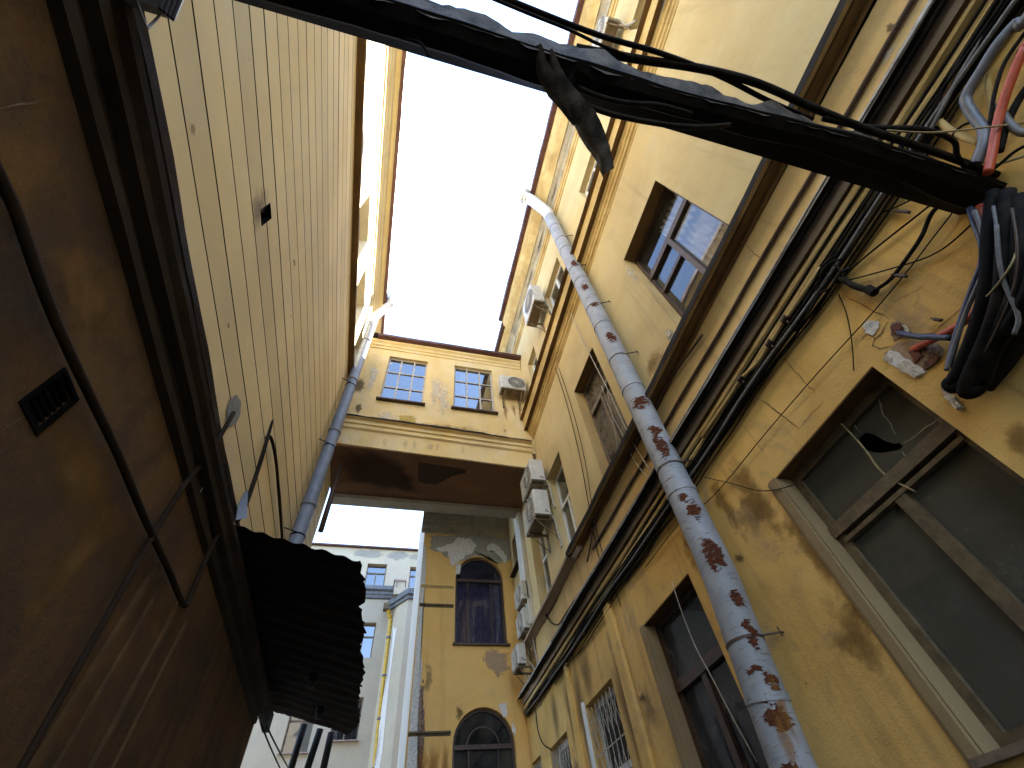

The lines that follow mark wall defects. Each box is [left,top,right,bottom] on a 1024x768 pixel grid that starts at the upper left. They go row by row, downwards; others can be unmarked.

flaking render [863,320,944,378]
corrosion [630,396,650,409]
crack [759,359,821,428]
flaking render [941,387,964,410]
water stain [351,455,410,490]
corrosion [647,425,670,465]
corrosion [678,493,728,573]
corrosion [728,589,761,650]
flaking render [406,535,511,768]
corrosion [746,664,802,768]